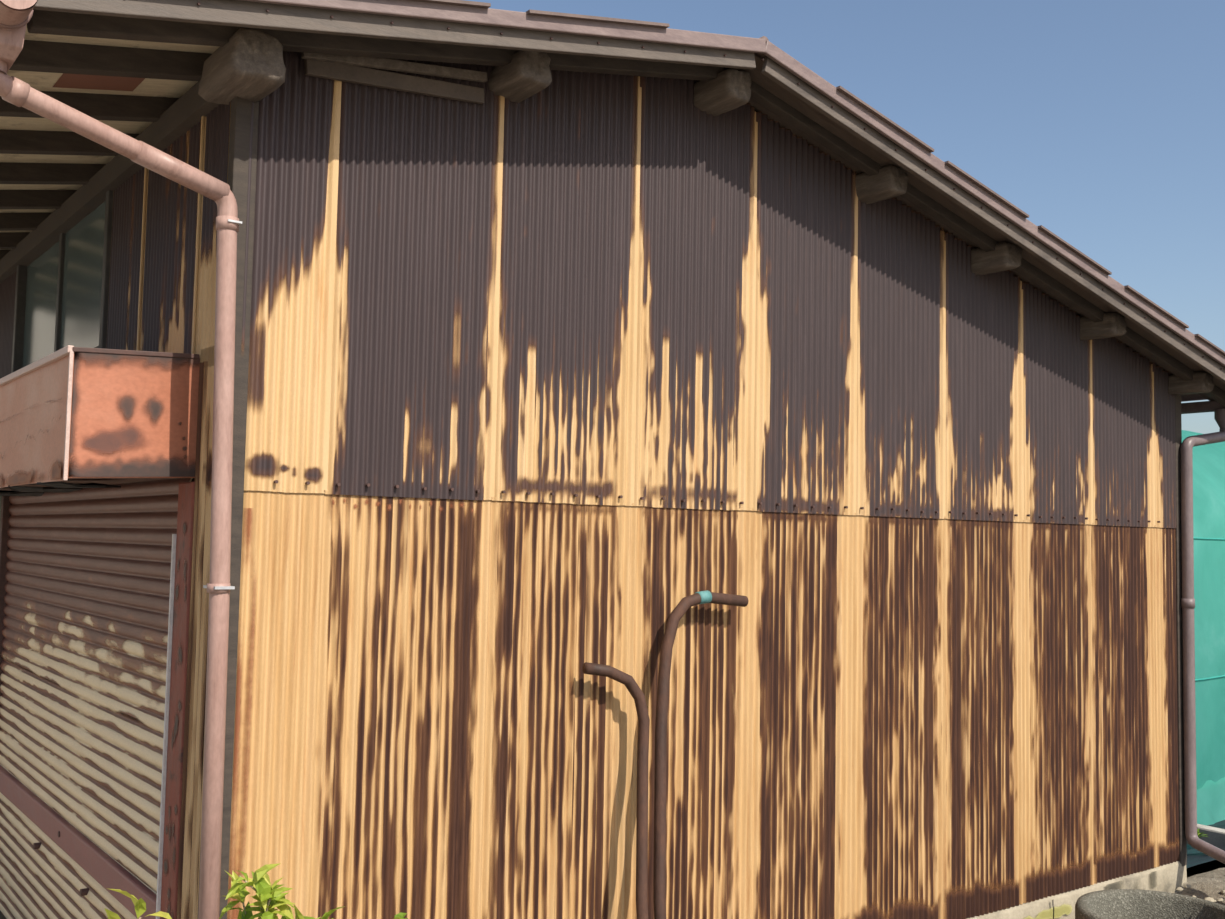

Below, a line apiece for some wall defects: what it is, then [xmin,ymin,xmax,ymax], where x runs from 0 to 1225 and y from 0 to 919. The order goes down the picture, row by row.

rust [0,167,217,919]
rust [163,51,1179,919]